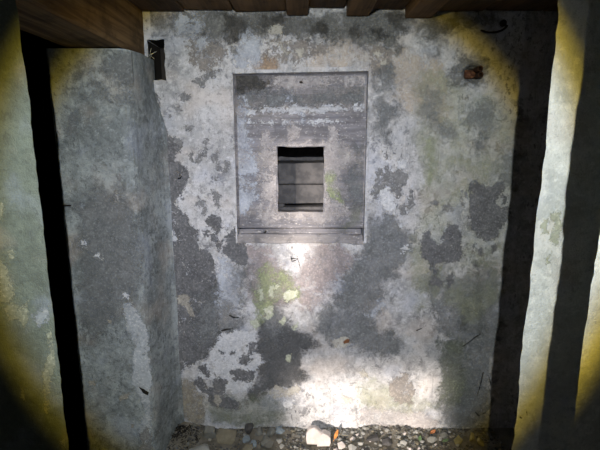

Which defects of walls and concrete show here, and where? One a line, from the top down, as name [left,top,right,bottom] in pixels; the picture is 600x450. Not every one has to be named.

damp [191,213,415,402]